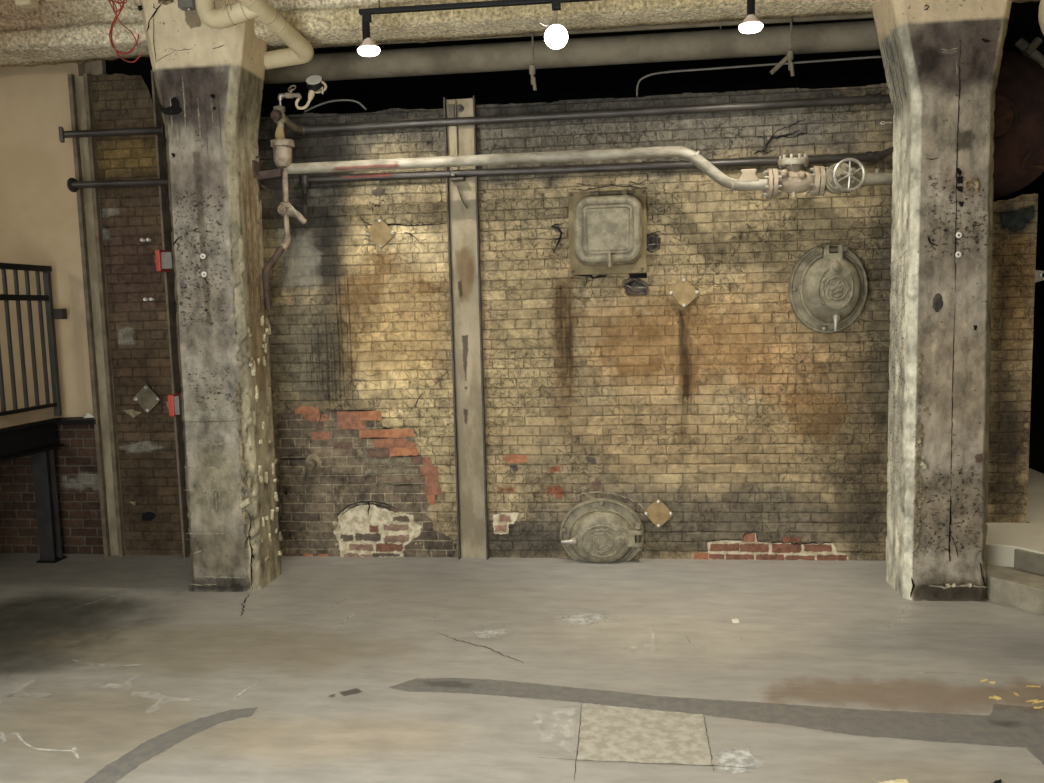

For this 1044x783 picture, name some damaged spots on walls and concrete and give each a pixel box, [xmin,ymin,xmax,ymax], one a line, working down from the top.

crack [754,119,811,155]
spalling [171,187,230,326]
peeling [187,316,456,562]
flaking render [694,531,849,561]